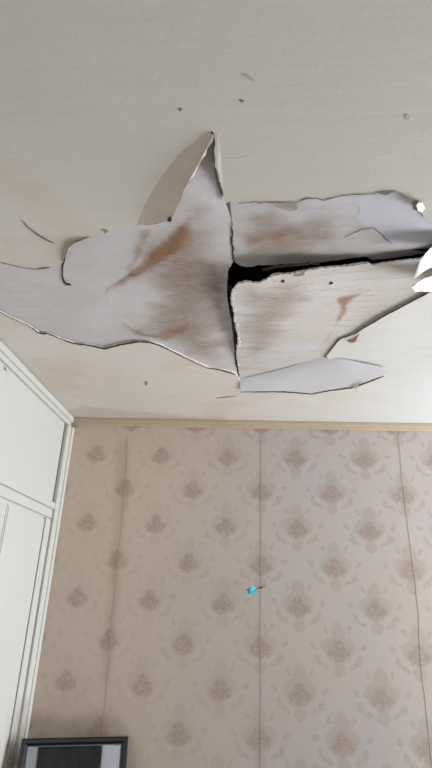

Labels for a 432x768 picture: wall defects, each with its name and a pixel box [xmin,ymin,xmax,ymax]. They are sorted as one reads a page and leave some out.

crack [0,193,430,375]
flaking render [0,131,432,373]